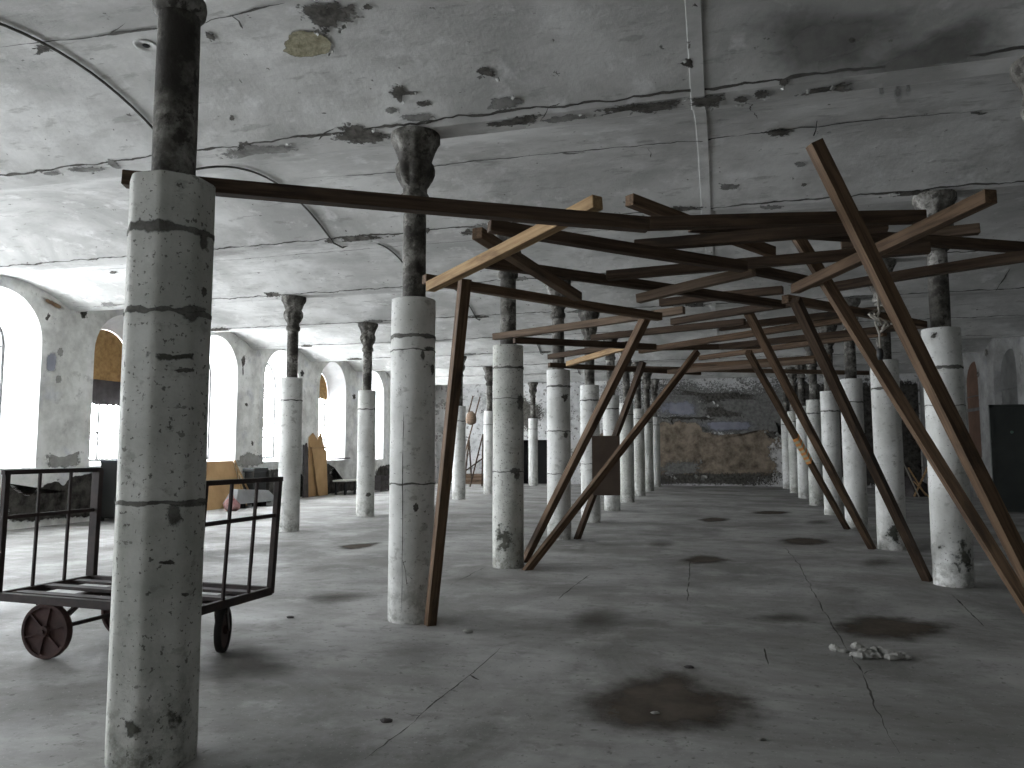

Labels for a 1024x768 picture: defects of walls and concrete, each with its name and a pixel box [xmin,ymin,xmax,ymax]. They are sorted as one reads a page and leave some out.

peeling [283,0,373,57]
crack [978,46,1024,56]
crack [197,66,1013,167]
peeling [486,90,769,127]
crack [0,155,152,176]
crack [783,546,897,748]
leakage [836,617,941,640]
crack [366,649,499,758]
leakage [587,673,750,729]